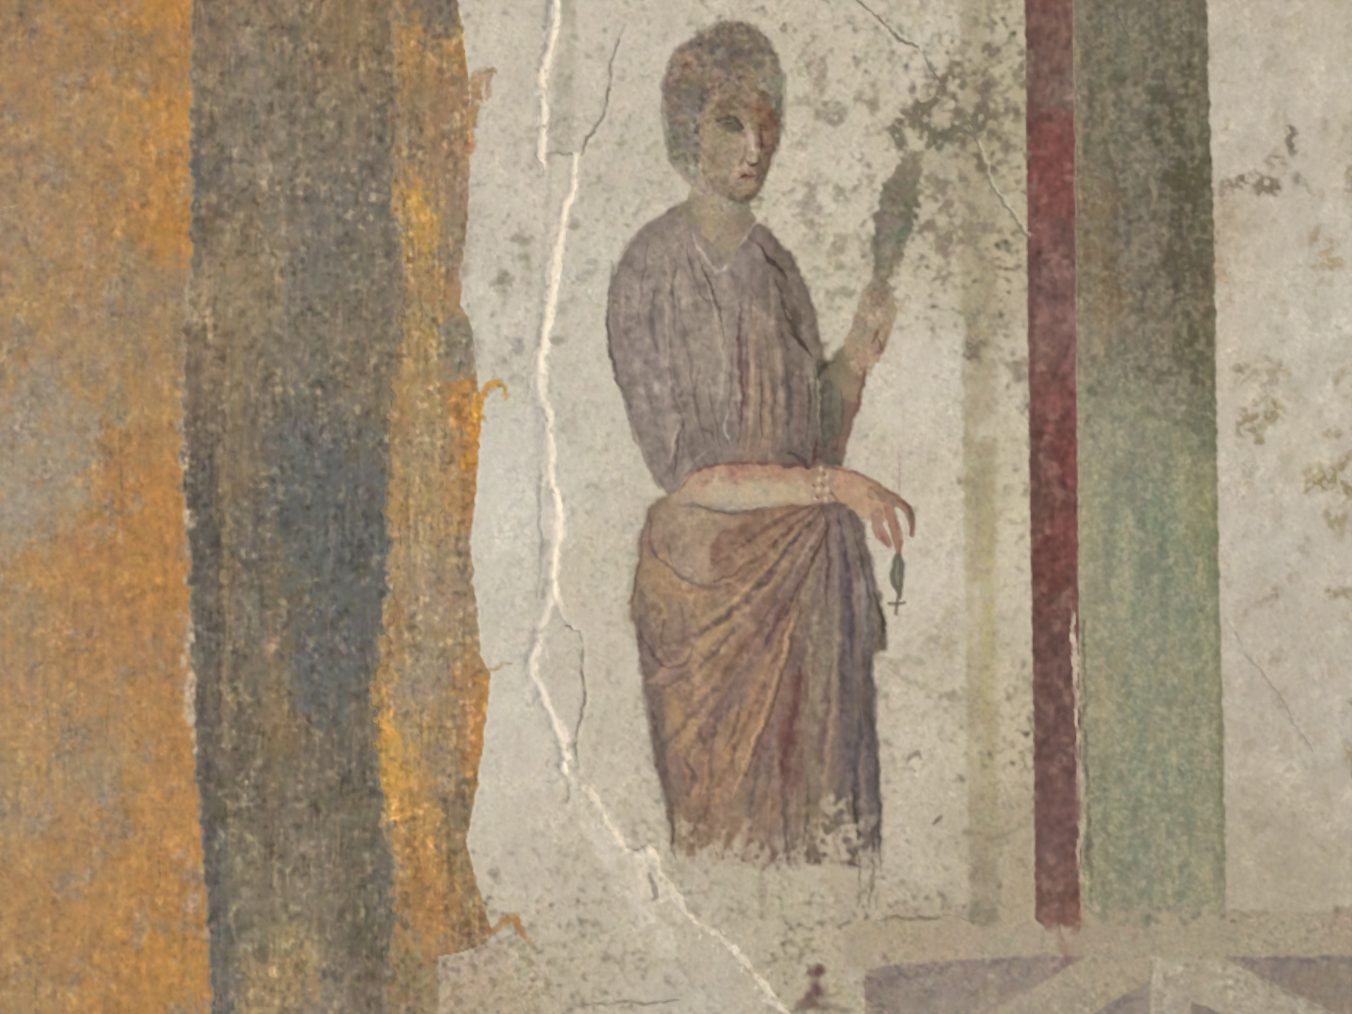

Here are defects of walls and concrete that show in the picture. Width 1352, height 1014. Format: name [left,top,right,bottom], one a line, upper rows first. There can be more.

crack [821,0,942,84]
crack [956,113,1028,237]
crack [525,0,793,1014]